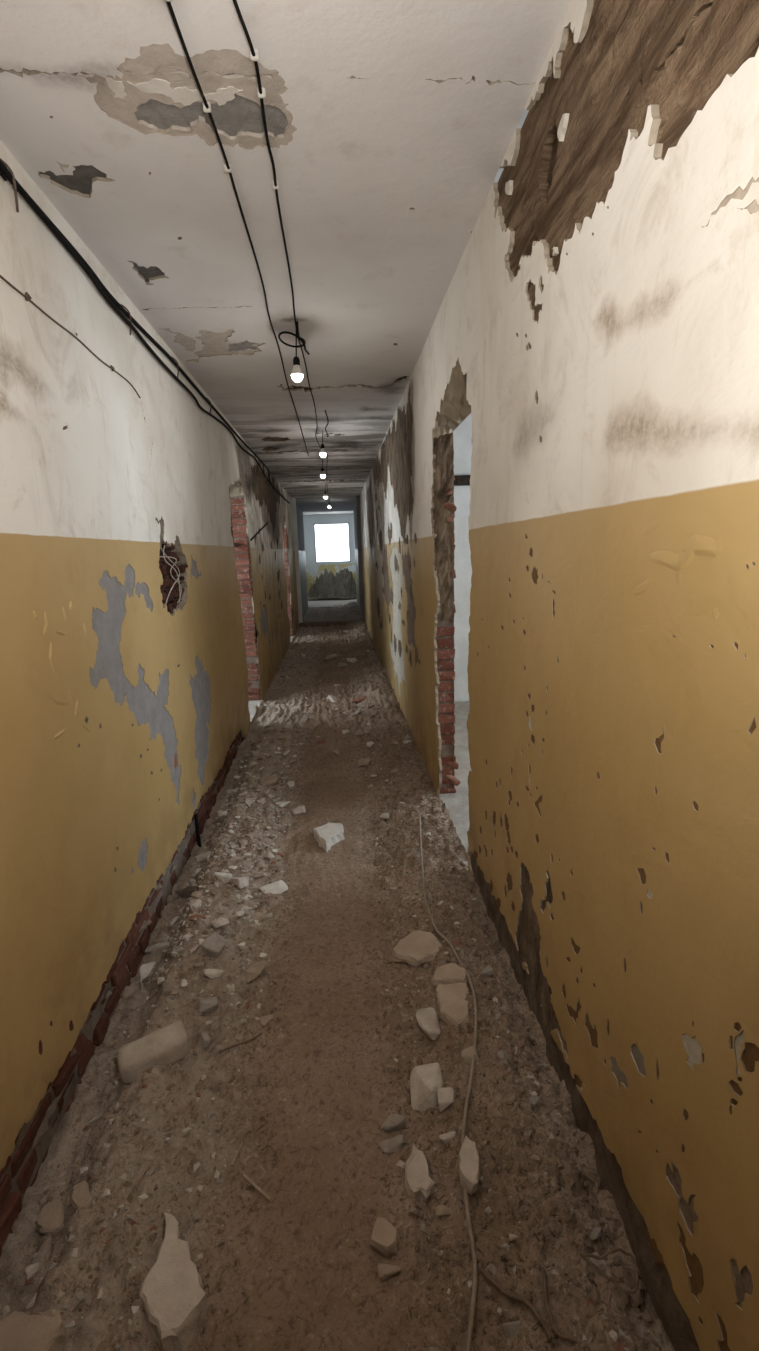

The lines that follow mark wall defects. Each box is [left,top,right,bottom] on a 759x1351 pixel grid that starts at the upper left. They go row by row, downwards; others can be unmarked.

spalling [87,43,296,149]
spalling [39,162,106,194]
spalling [498,0,759,321]
spalling [133,262,165,282]
spalling [160,328,262,362]
spalling [525,535,556,616]
flaking render [0,544,244,1257]
spalling [470,693,730,1351]
peeling [730,1022,759,1115]
peeling [732,1259,753,1308]